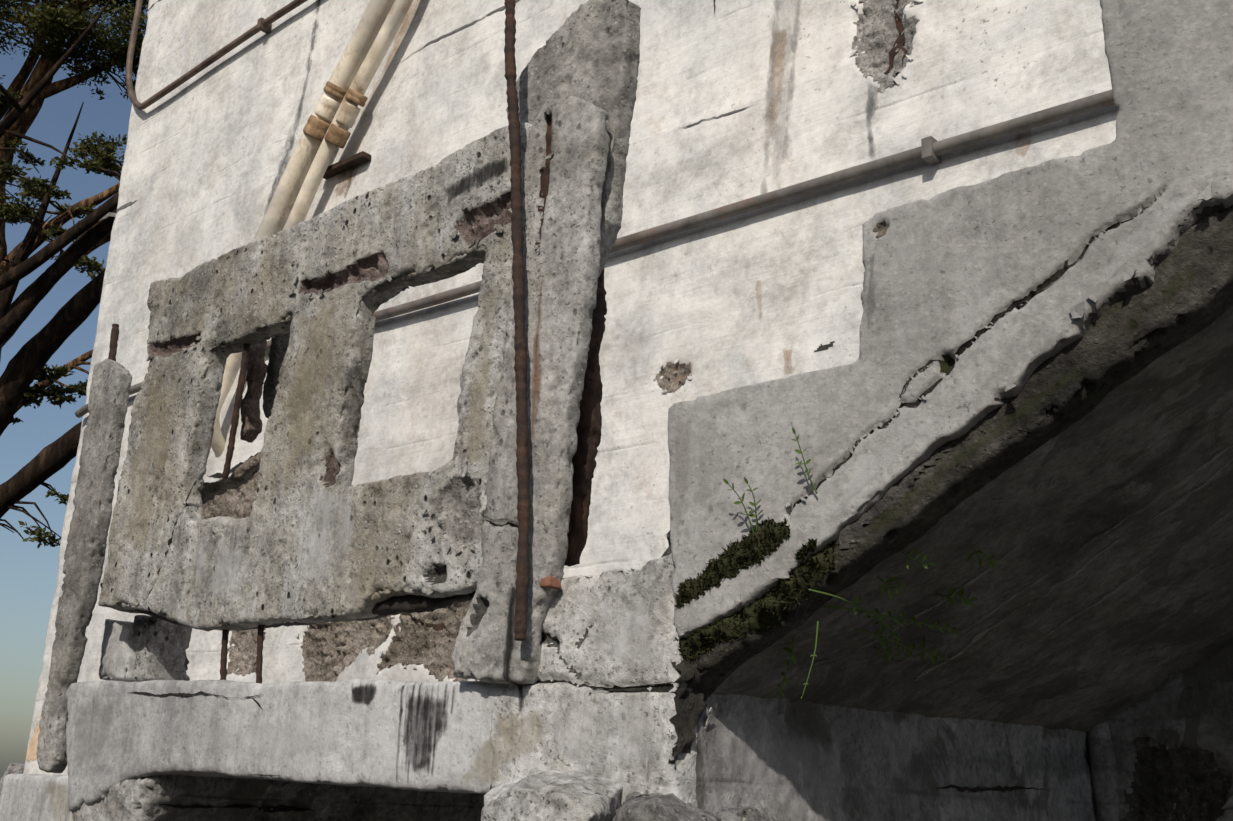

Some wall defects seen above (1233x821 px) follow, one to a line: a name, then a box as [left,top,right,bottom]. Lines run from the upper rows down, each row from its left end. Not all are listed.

crack [401,0,518,62]
spalling [849,0,923,93]
crack [681,103,757,128]
rust [564,267,607,567]
spalling [653,358,692,393]
crack [785,200,1156,515]
spalling [295,469,489,682]
crack [129,691,262,709]
crack [158,804,314,813]
water stain [396,684,454,780]
crack [937,784,1049,793]
spalling [1120,731,1233,821]